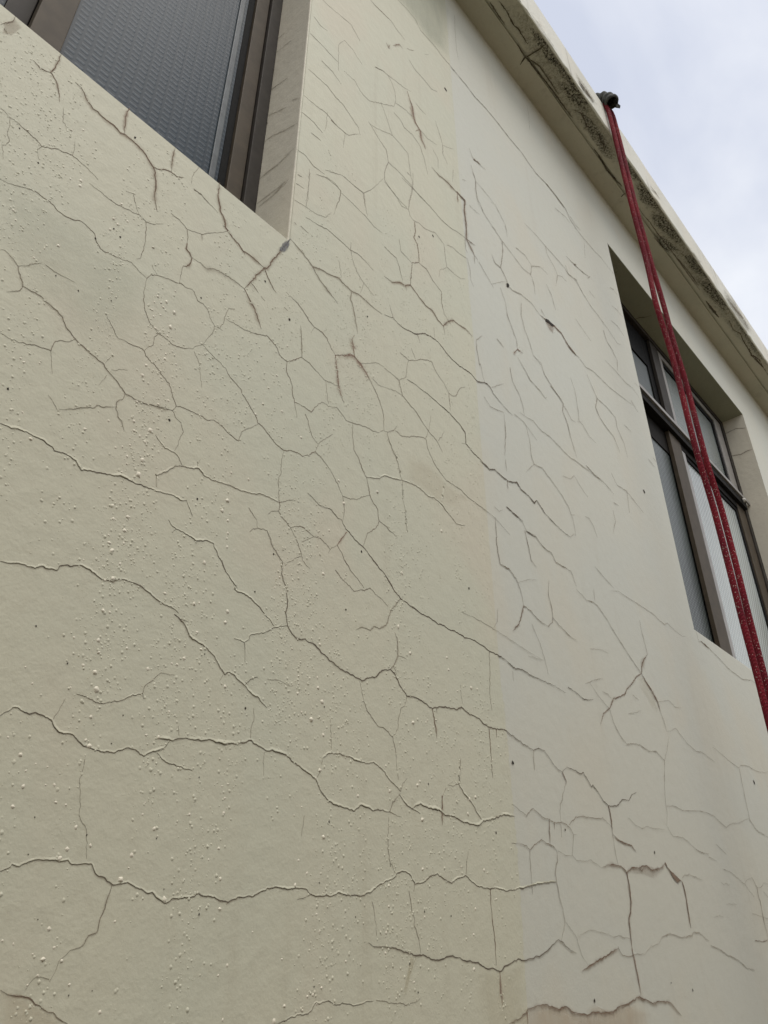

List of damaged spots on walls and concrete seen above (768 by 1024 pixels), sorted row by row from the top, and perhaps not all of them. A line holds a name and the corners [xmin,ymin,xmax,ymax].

crack [273,0,362,146]
leakage [533,32,609,156]
leakage [628,163,745,330]
crack [0,67,768,837]
crack [0,703,768,1024]